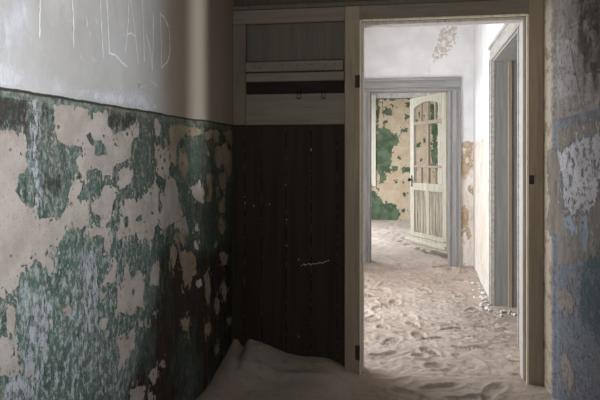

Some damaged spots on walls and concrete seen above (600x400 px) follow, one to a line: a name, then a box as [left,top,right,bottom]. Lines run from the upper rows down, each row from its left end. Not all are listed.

peeling [0,104,233,381]
peeling [371,93,438,221]
peeling [461,136,492,311]
peeling [546,117,600,263]
peeling [130,354,165,400]